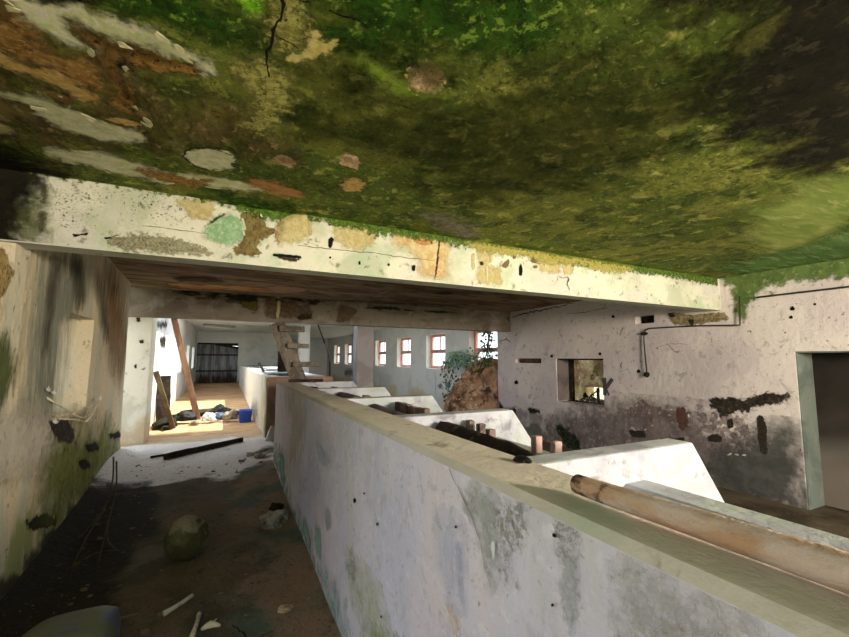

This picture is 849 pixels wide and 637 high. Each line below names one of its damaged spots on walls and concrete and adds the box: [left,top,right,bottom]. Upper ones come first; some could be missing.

peeling [3,0,216,76]
crack [265,0,309,77]
crack [328,10,368,27]
peeling [0,92,153,143]
leakage [660,0,849,176]
peeling [45,147,265,192]
spalling [233,212,275,257]
spalling [0,246,15,298]
leakage [544,401,804,504]
spalling [627,391,790,456]